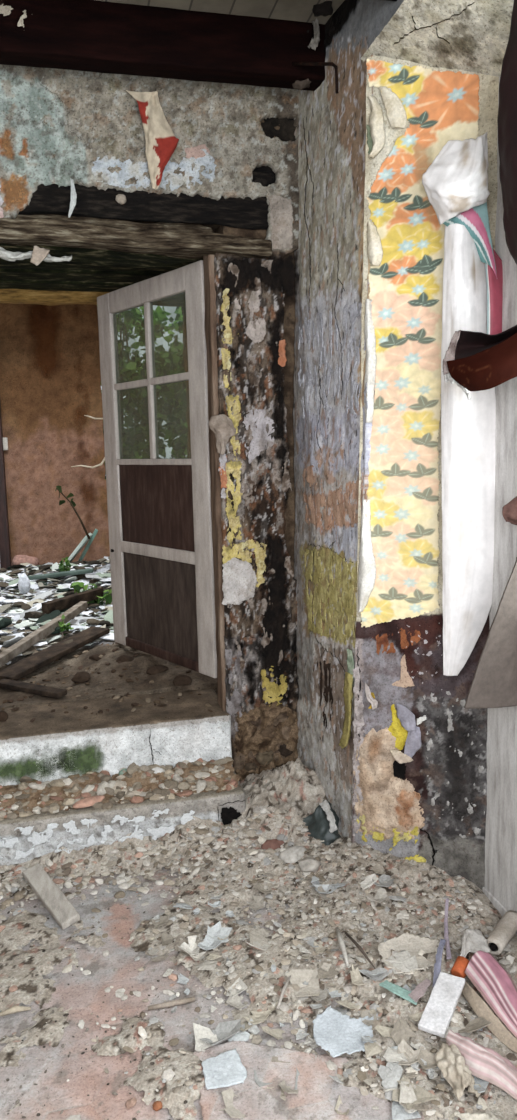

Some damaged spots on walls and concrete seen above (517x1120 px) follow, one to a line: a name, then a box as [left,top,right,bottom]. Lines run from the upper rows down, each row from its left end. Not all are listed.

peeling [0,4,27,28]
crack [393,3,473,45]
spalling [261,117,296,142]
peeling [91,144,217,191]
peeling [68,178,77,218]
peeling [0,247,72,262]
peeling [298,301,368,421]
peeling [218,194,294,648]
peeling [275,460,368,530]
leakage [234,534,299,708]
peeling [0,547,507,1120]
peeling [496,944,517,985]